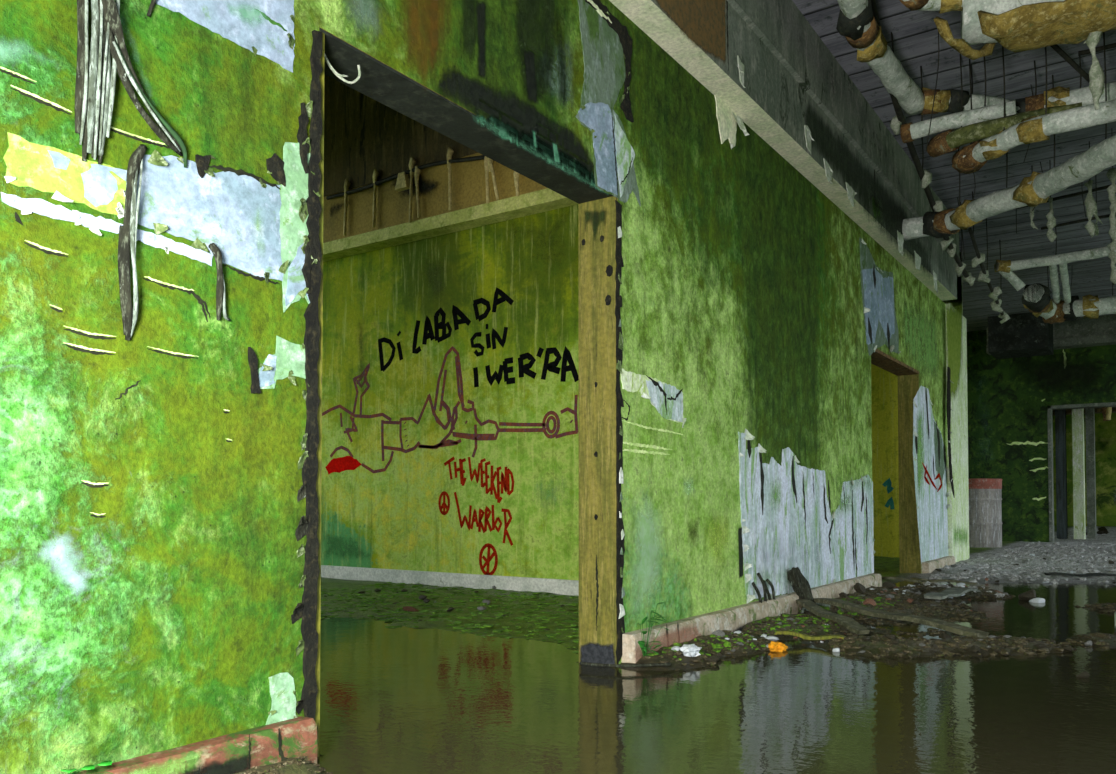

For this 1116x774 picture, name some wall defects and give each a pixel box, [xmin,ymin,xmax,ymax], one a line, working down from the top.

peeling [156,0,295,73]
peeling [1,30,323,730]
peeling [575,0,687,664]
peeling [738,428,875,603]
peeling [913,367,954,564]